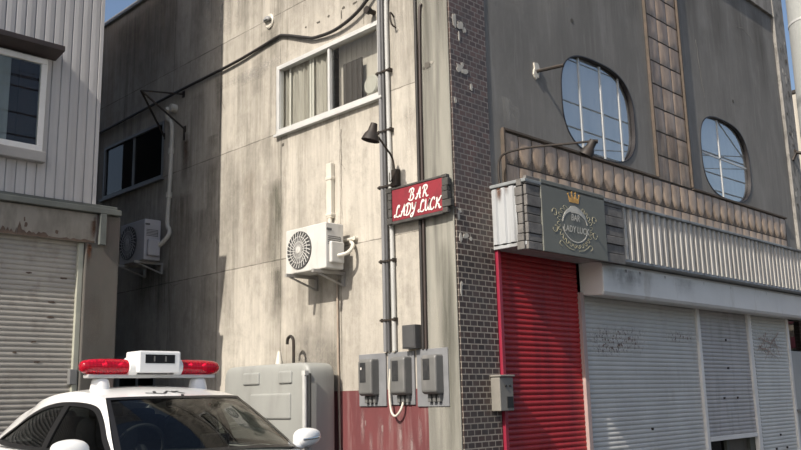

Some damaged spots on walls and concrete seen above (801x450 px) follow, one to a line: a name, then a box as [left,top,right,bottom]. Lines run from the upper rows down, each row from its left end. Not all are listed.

peeling [452,14,466,41]